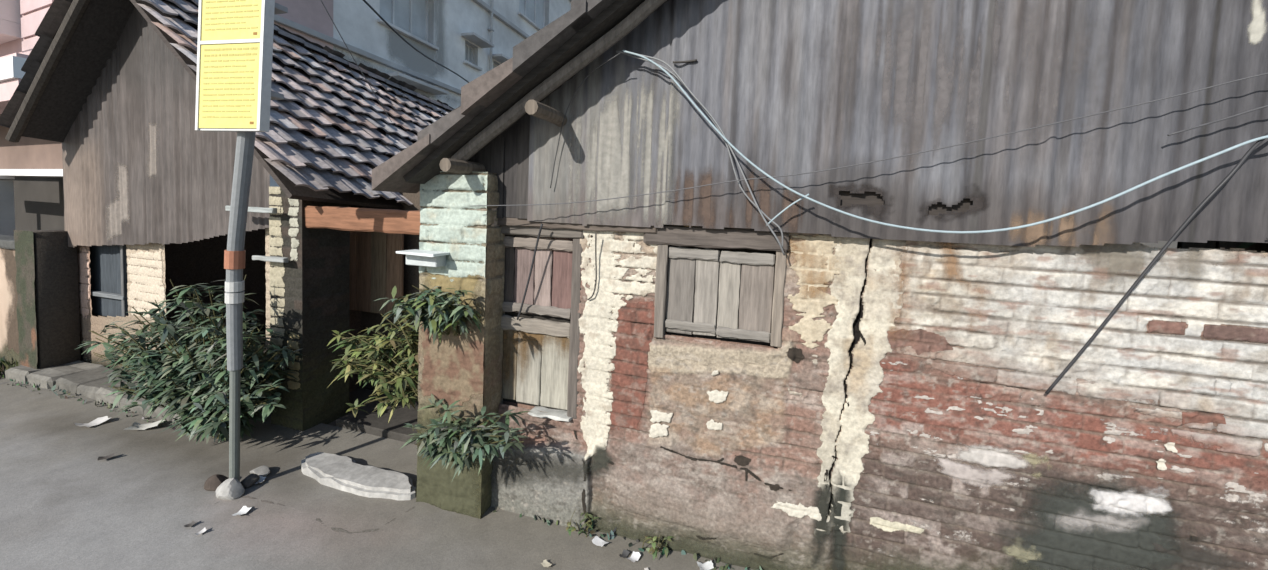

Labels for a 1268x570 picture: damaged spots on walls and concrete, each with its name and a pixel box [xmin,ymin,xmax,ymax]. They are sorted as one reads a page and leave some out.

peeling [577,230,658,460]
crack [824,239,872,504]
peeling [786,234,1268,543]
damp [491,447,611,483]
crack [660,446,791,491]
damp [936,446,1029,486]
damp [870,517,924,534]
damp [1008,482,1242,570]